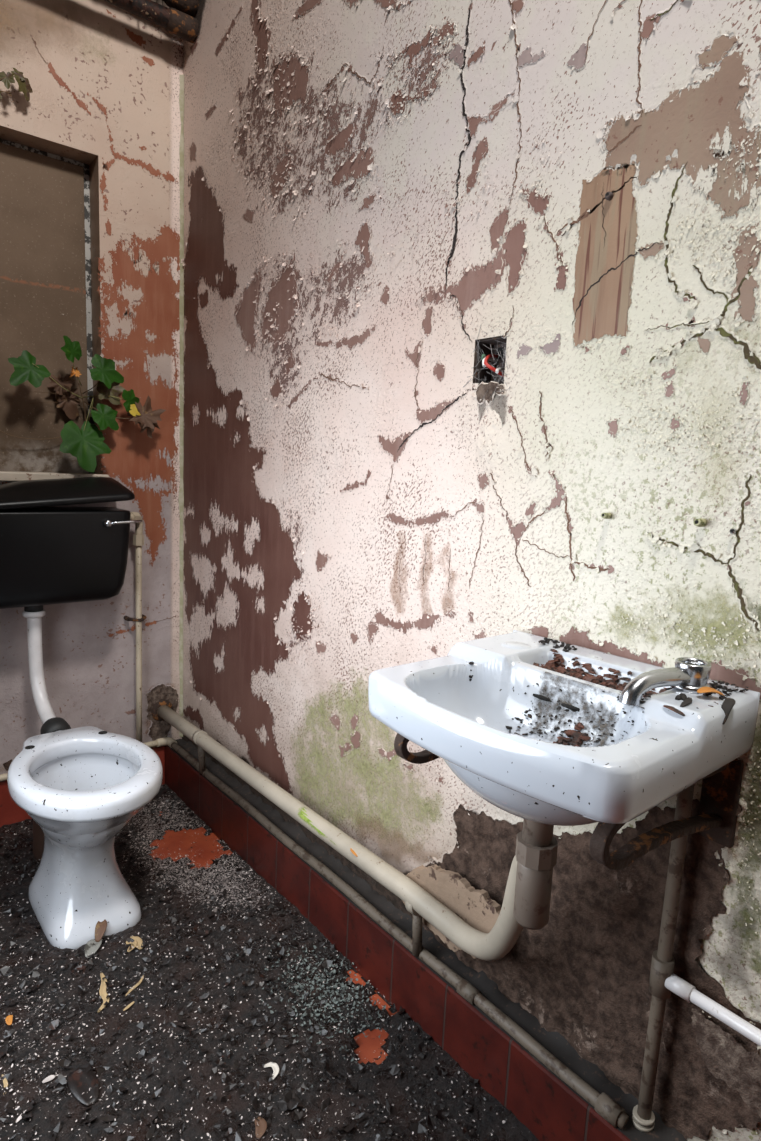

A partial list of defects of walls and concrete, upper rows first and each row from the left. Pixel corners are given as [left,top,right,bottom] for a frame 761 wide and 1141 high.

crack [444,0,474,344]
crack [584,0,685,153]
peeling [516,31,761,358]
crack [538,163,761,375]
peeling [47,0,566,795]
crack [399,469,614,596]
crack [508,390,553,478]
crack [646,473,761,632]
water stain [182,734,423,927]
flaking render [422,800,523,908]
flaking render [422,826,671,1100]
flaking render [652,740,761,1141]